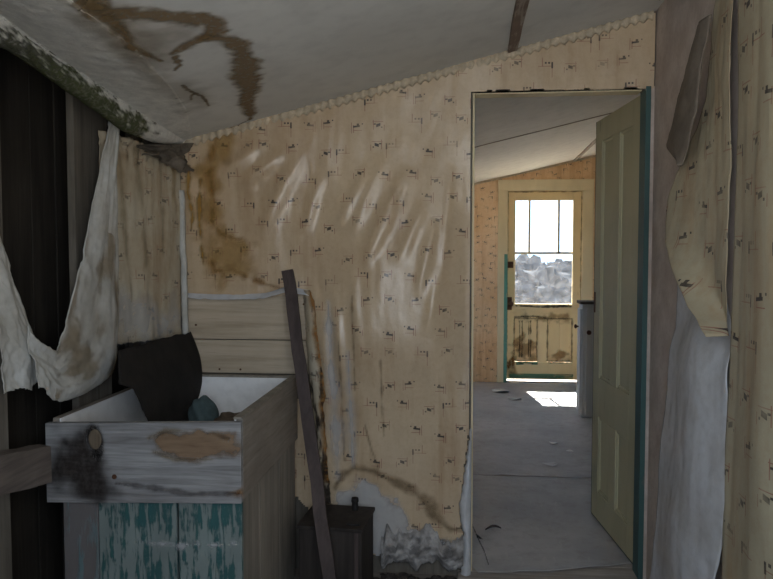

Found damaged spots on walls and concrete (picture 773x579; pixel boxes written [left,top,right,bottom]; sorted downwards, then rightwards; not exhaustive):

damp [0,28,159,138]
damp [73,0,262,129]